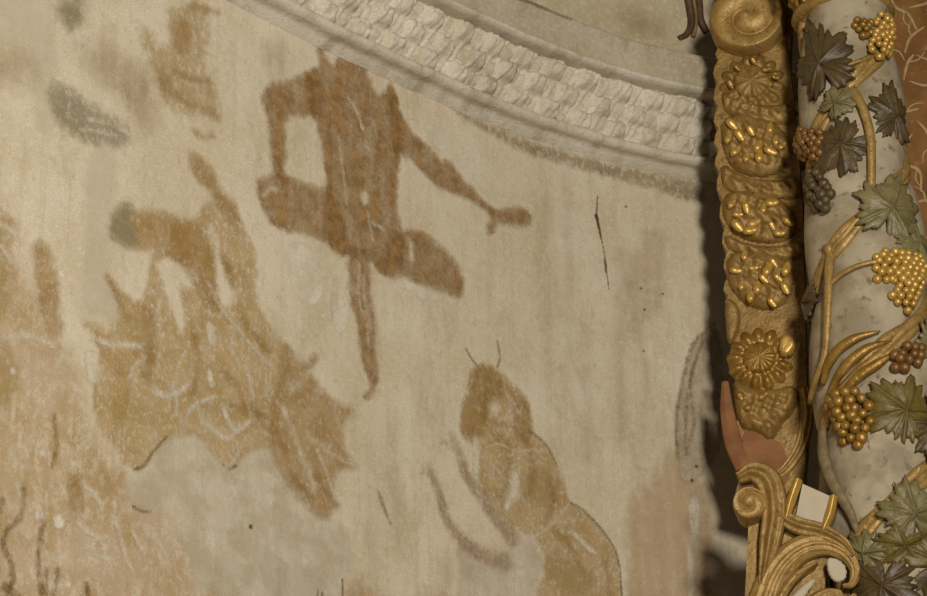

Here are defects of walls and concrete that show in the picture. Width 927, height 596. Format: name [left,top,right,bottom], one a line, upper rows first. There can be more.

crack [594,197,609,285]